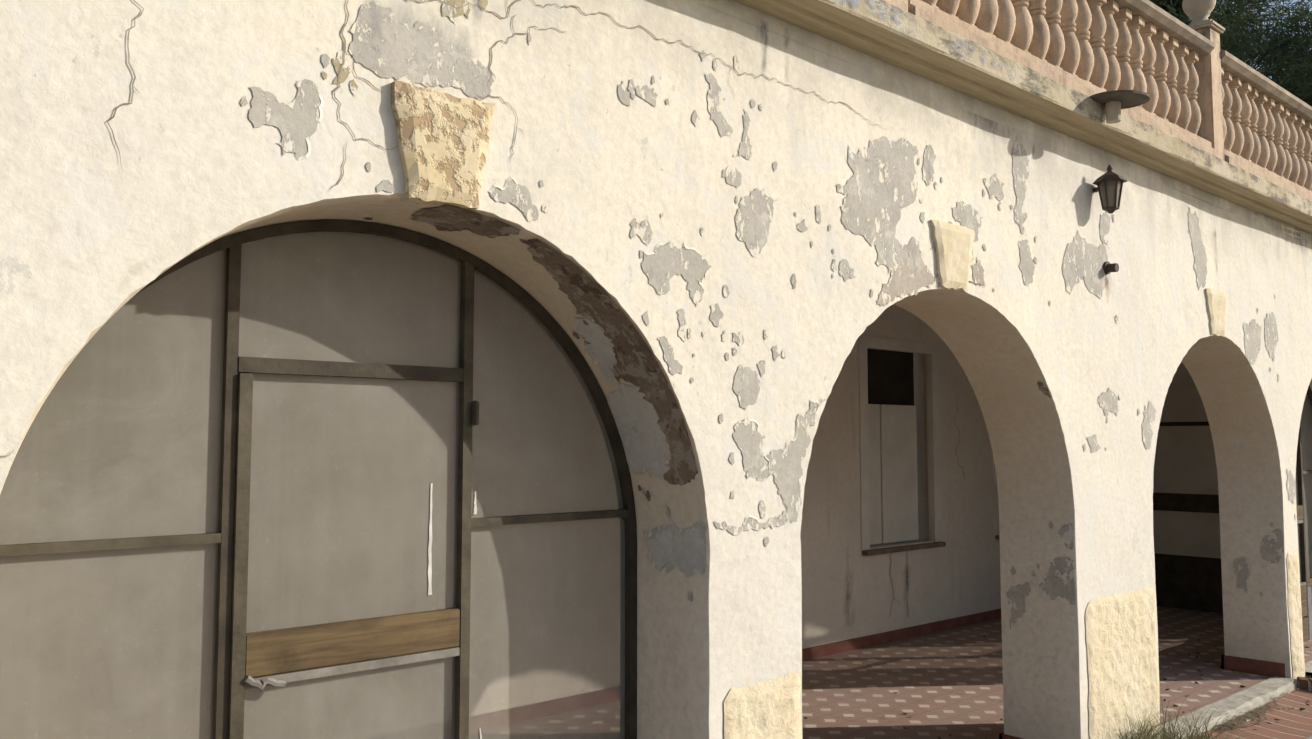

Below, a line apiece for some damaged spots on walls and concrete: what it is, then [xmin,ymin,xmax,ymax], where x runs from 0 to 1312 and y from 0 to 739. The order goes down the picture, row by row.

crack [107,0,144,172]
crack [330,0,398,190]
peeling [240,0,496,161]
crack [428,0,881,162]
peeling [692,50,778,257]
peeling [794,136,943,306]
spalling [411,176,826,602]
peeling [1006,521,1075,631]